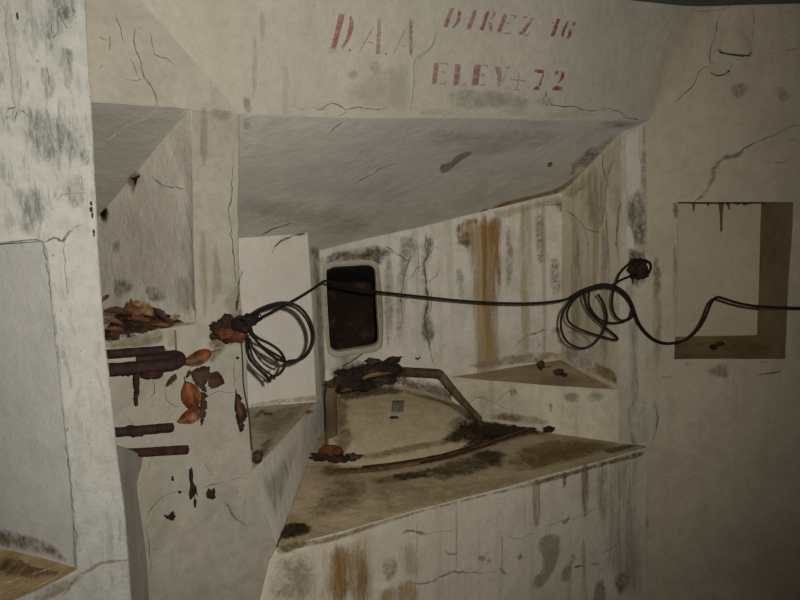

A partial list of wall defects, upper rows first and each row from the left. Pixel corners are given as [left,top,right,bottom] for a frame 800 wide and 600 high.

crack [103,13,172,143]
crack [675,10,720,103]
crack [317,103,385,131]
crack [698,125,800,199]
water stain [674,202,760,232]
crack [386,232,439,366]
corrosion [458,218,501,372]
corrosion [133,374,141,406]
corrosion [329,549,367,600]